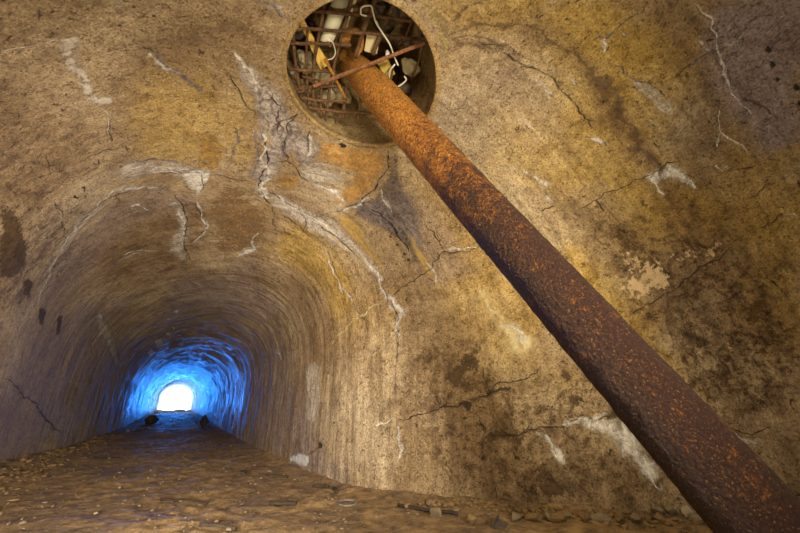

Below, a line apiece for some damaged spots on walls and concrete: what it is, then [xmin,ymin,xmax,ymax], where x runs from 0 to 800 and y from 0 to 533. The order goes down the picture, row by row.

crack [674,8,778,118]
water stain [120,158,210,194]
water stain [233,52,344,202]
crack [37,73,540,459]
water stain [271,196,373,271]
rust [320,144,384,203]
rust [408,235,438,282]
crack [578,142,673,264]
peeling [617,251,670,300]
peeling [670,242,721,267]
crack [716,111,754,169]
water stain [577,420,662,489]